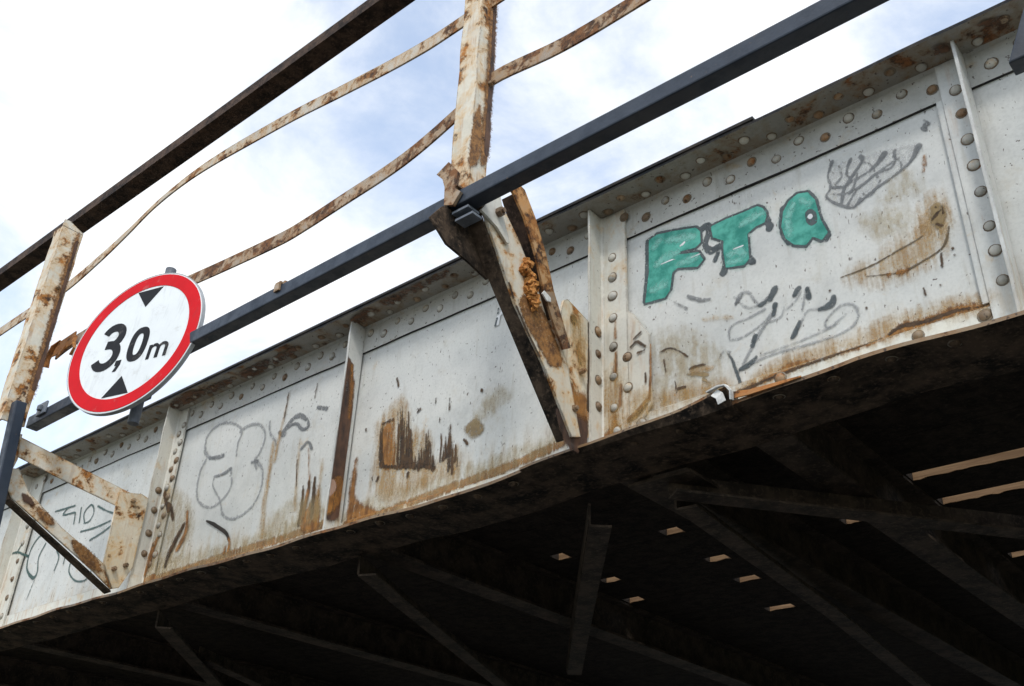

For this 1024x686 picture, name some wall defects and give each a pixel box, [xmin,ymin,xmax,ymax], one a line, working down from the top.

rust [467,0,498,169]
rust [25,232,80,404]
rust [508,282,563,367]
rust [604,331,652,436]
rust [737,298,989,391]
rust [143,317,590,582]
rust [22,493,55,525]
rust [71,540,103,572]